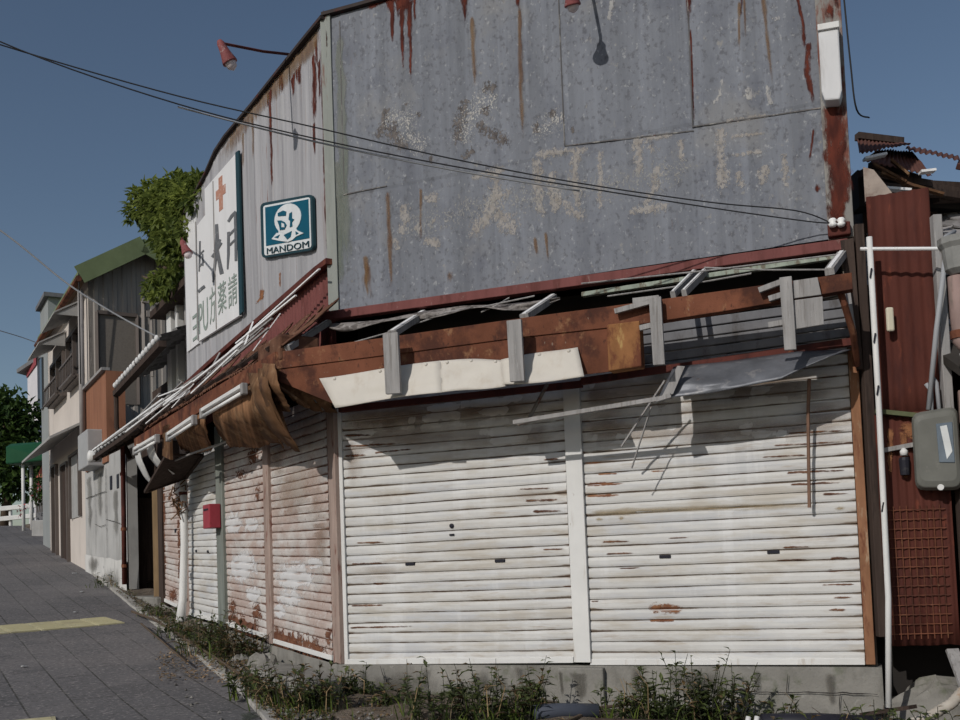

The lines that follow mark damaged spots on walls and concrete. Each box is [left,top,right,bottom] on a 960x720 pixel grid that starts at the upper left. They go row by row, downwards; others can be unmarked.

corrosion [369,0,416,74]
corrosion [267,36,327,220]
peeling [380,97,432,164]
peeling [455,81,509,160]
corrosion [809,102,852,223]
corrosion [163,487,181,579]
peeling [225,512,258,534]
corrosion [228,599,262,638]
peeling [246,587,261,603]
peeling [306,558,323,569]
corrosion [649,604,681,622]
corrosion [887,504,953,640]